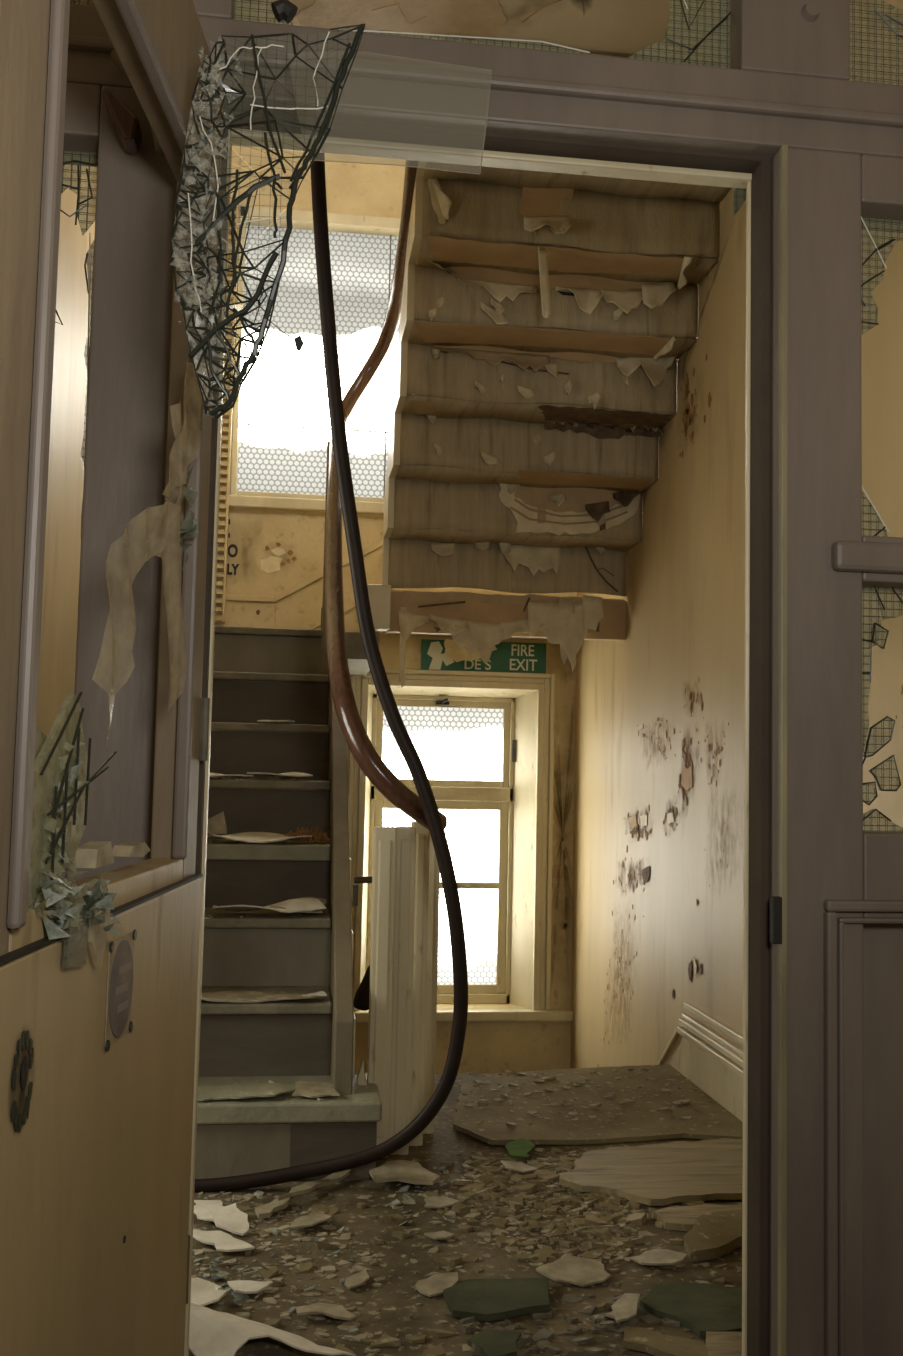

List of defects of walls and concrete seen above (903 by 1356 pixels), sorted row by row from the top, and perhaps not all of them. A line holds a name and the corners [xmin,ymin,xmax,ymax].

peeling [296,0,507,43]
peeling [415,178,693,577]
peeling [399,591,604,689]